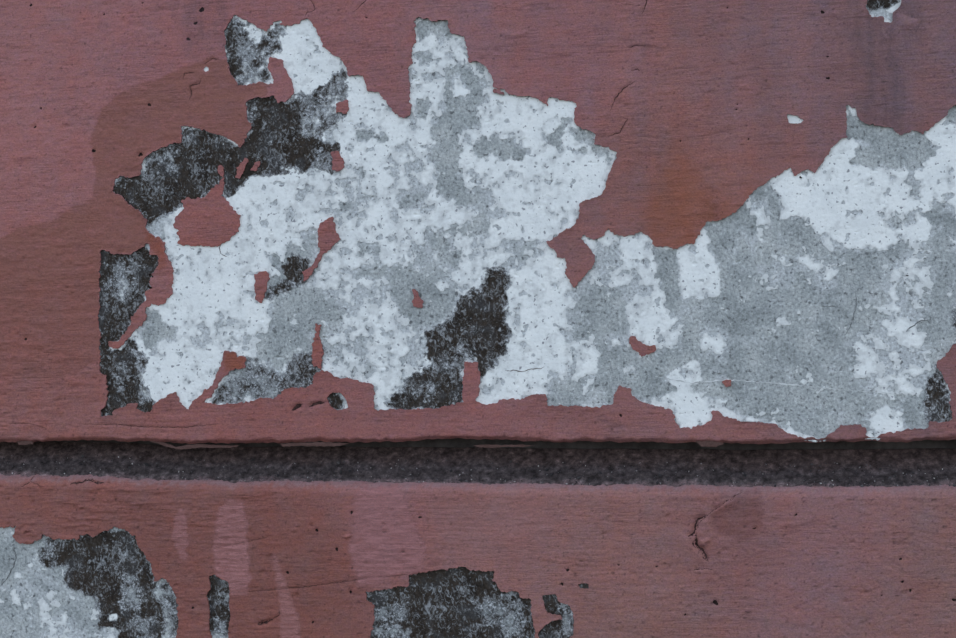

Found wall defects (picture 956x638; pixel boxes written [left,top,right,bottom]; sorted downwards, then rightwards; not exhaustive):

peeling [866,0,901,23]
peeling [108,15,956,442]
peeling [0,526,120,638]
peeling [148,562,177,638]